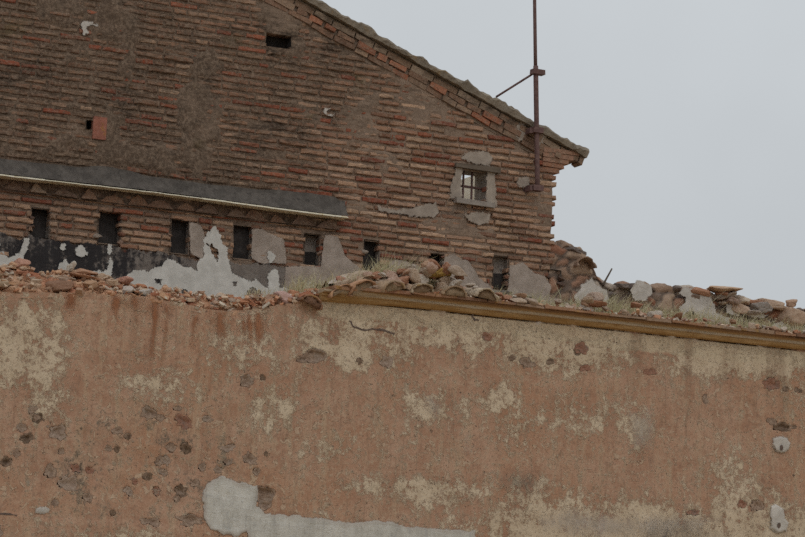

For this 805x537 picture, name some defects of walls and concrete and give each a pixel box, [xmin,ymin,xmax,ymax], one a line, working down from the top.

peeling [0,238,30,265]
peeling [58,243,88,275]
peeling [94,240,124,276]
peeling [127,226,287,298]
spalling [766,418,797,431]